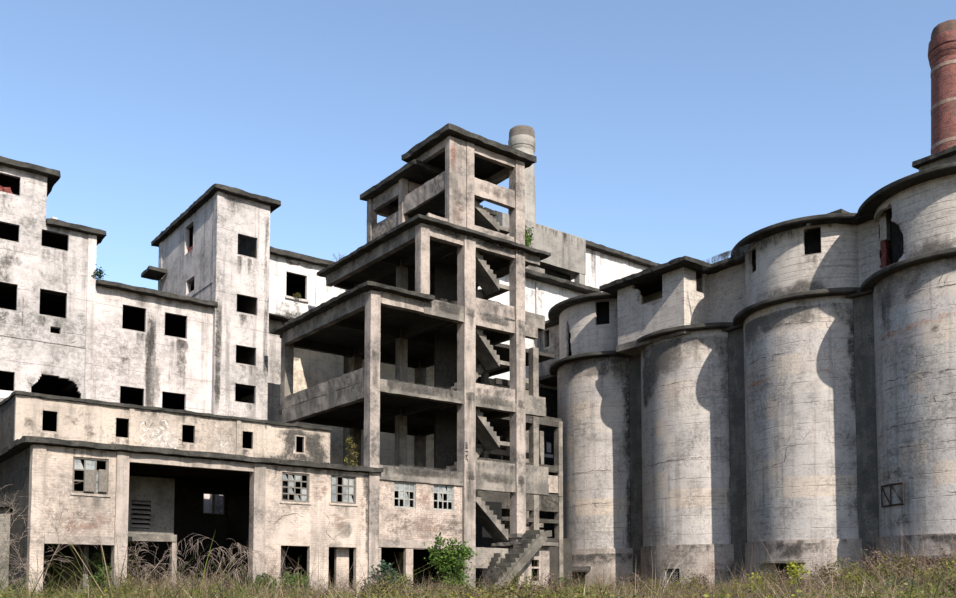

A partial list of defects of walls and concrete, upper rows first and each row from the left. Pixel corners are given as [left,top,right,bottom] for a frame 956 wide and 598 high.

water stain [142,319,158,414]
water stain [572,356,630,456]
water stain [643,338,702,404]
water stain [273,429,324,471]
water stain [572,482,632,562]